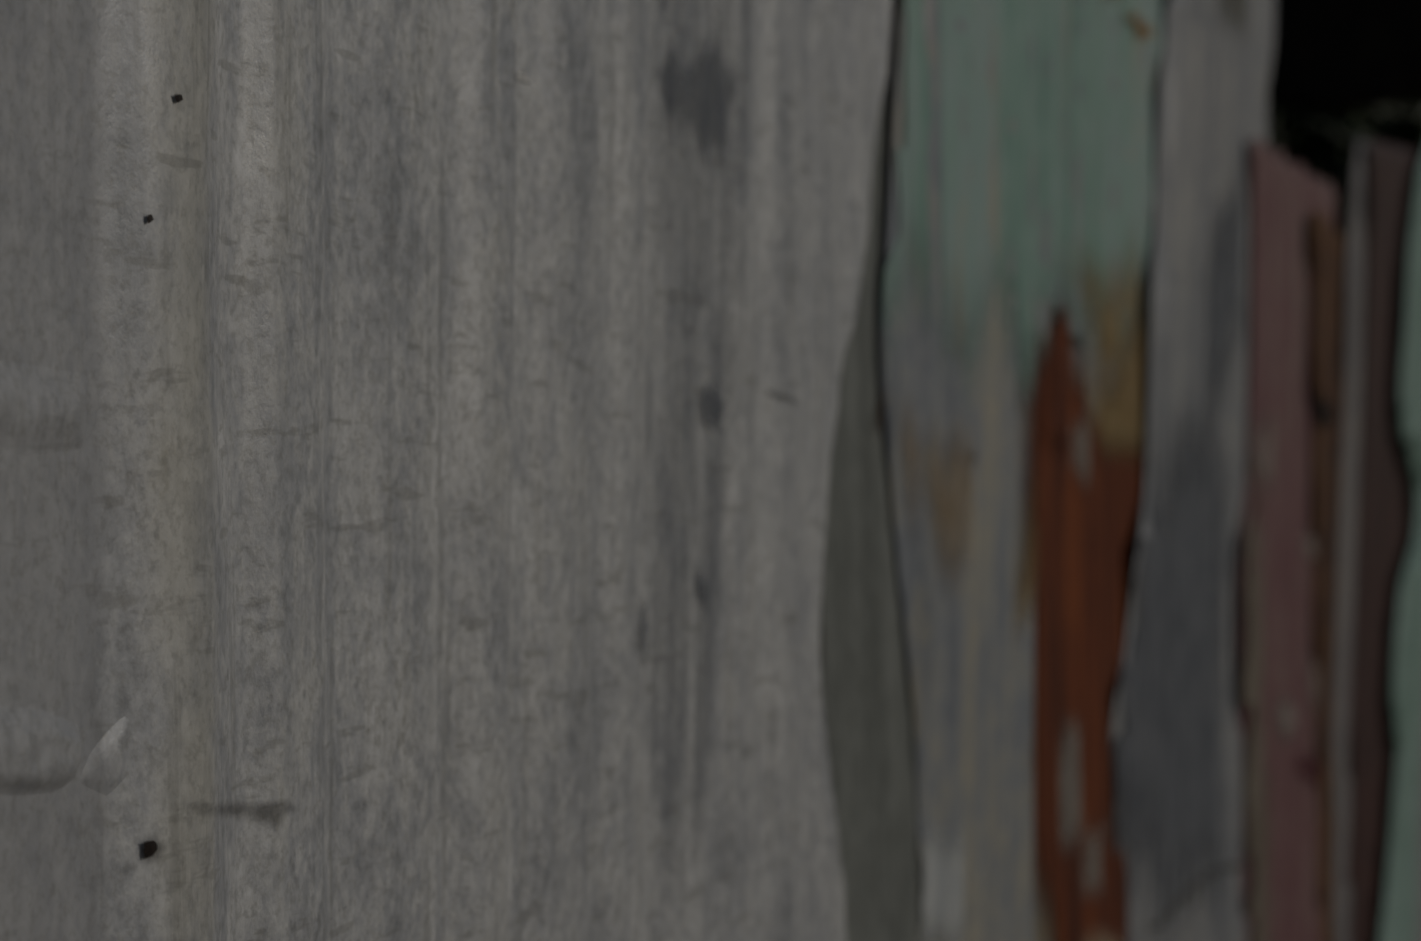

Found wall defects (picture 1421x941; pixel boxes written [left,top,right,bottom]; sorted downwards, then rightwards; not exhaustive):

rust [1017,273,1147,941]